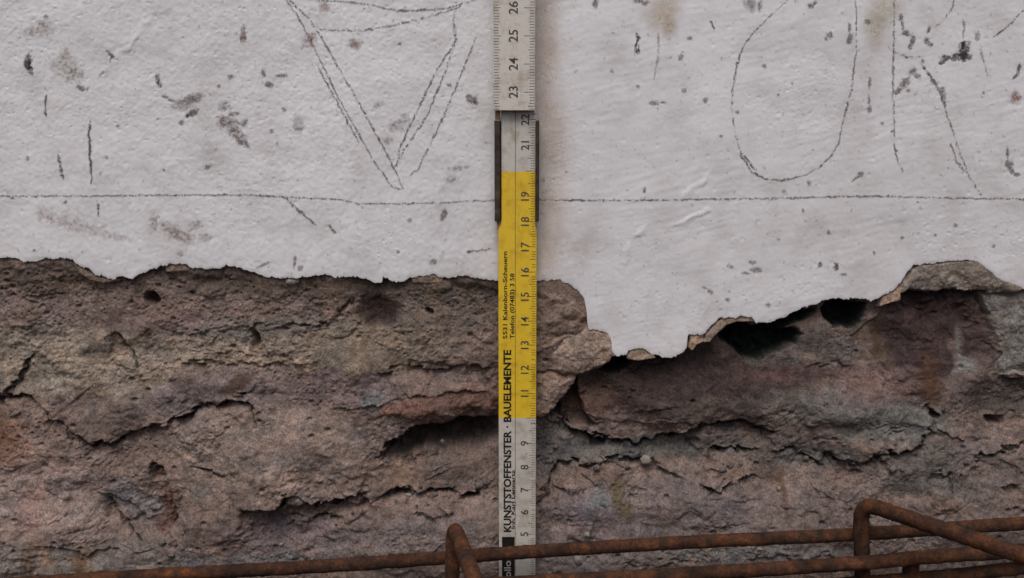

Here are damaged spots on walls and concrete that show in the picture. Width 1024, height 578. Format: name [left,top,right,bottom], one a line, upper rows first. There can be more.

crack [7,353,35,397]
crack [62,421,146,446]
crack [170,392,256,423]
spalling [0,250,499,578]
crack [537,407,939,503]
spalling [535,260,1024,575]
crack [976,441,1024,461]
crack [383,487,479,520]